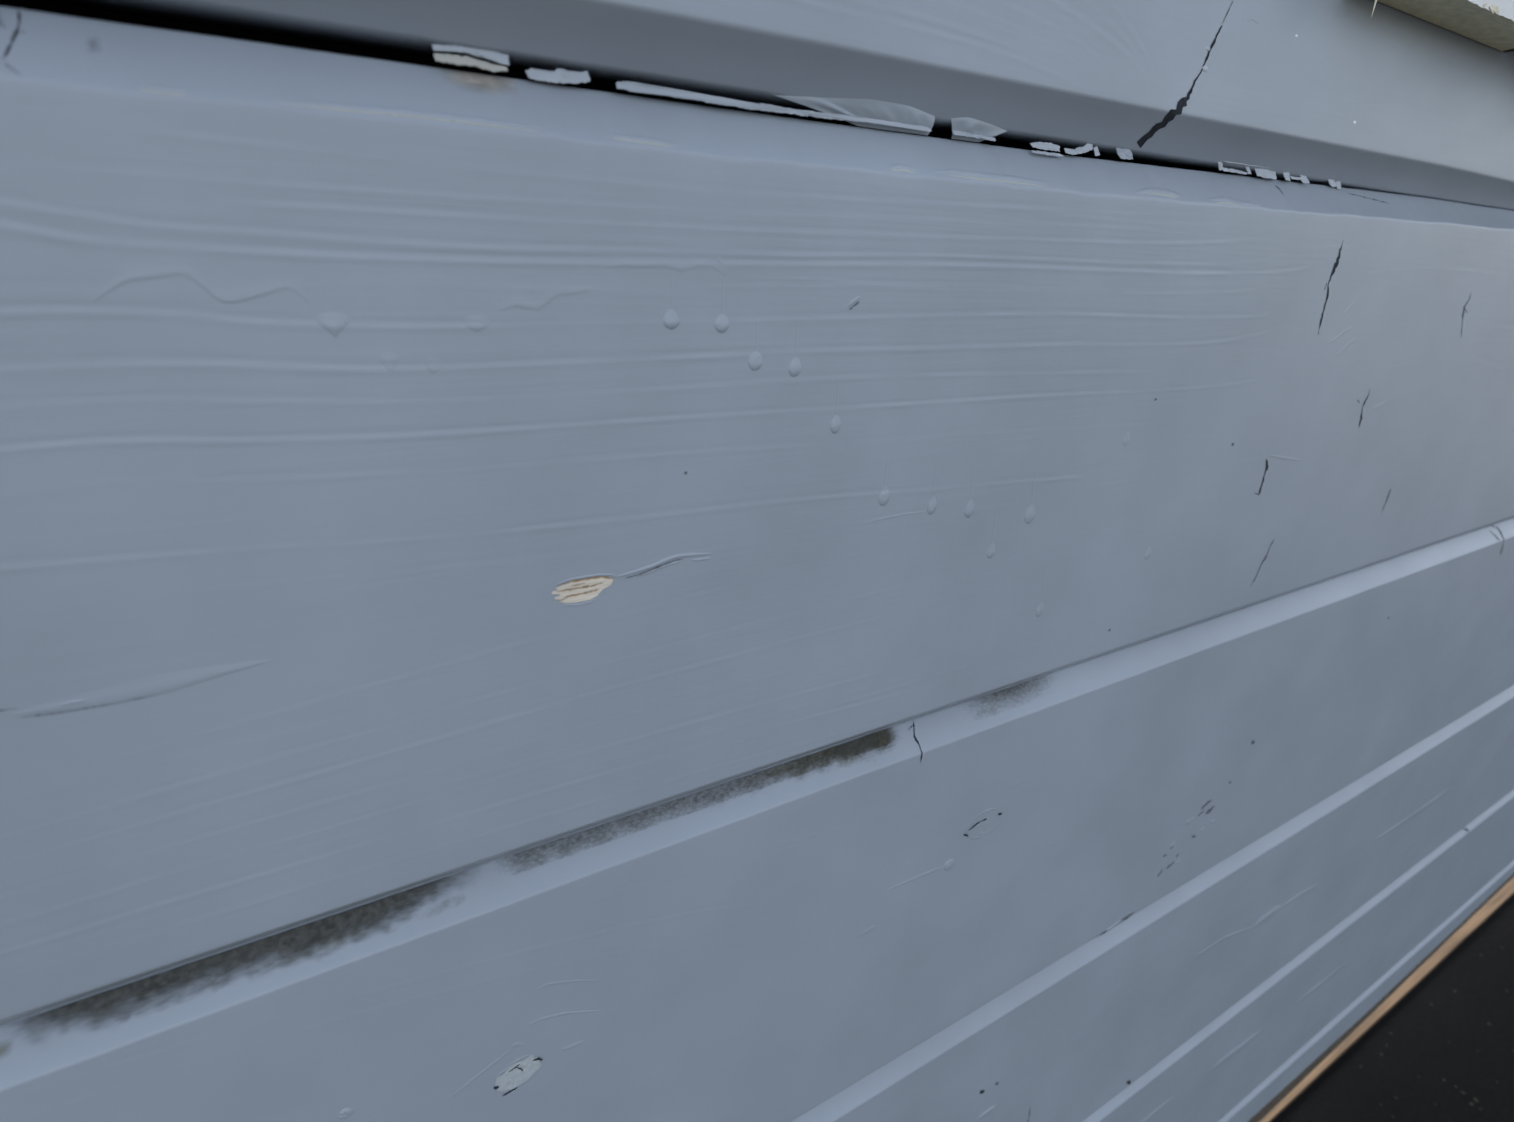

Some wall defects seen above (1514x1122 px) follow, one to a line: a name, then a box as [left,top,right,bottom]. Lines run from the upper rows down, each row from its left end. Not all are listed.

peeling [431,44,590,84]
crack [1137,0,1234,148]
peeling [616,81,1007,142]
peeling [1030,142,1133,160]
peeling [1217,160,1341,189]
crack [1318,241,1345,334]
peeling [552,573,618,606]
leakage [515,728,894,862]
leakage [30,877,448,1023]